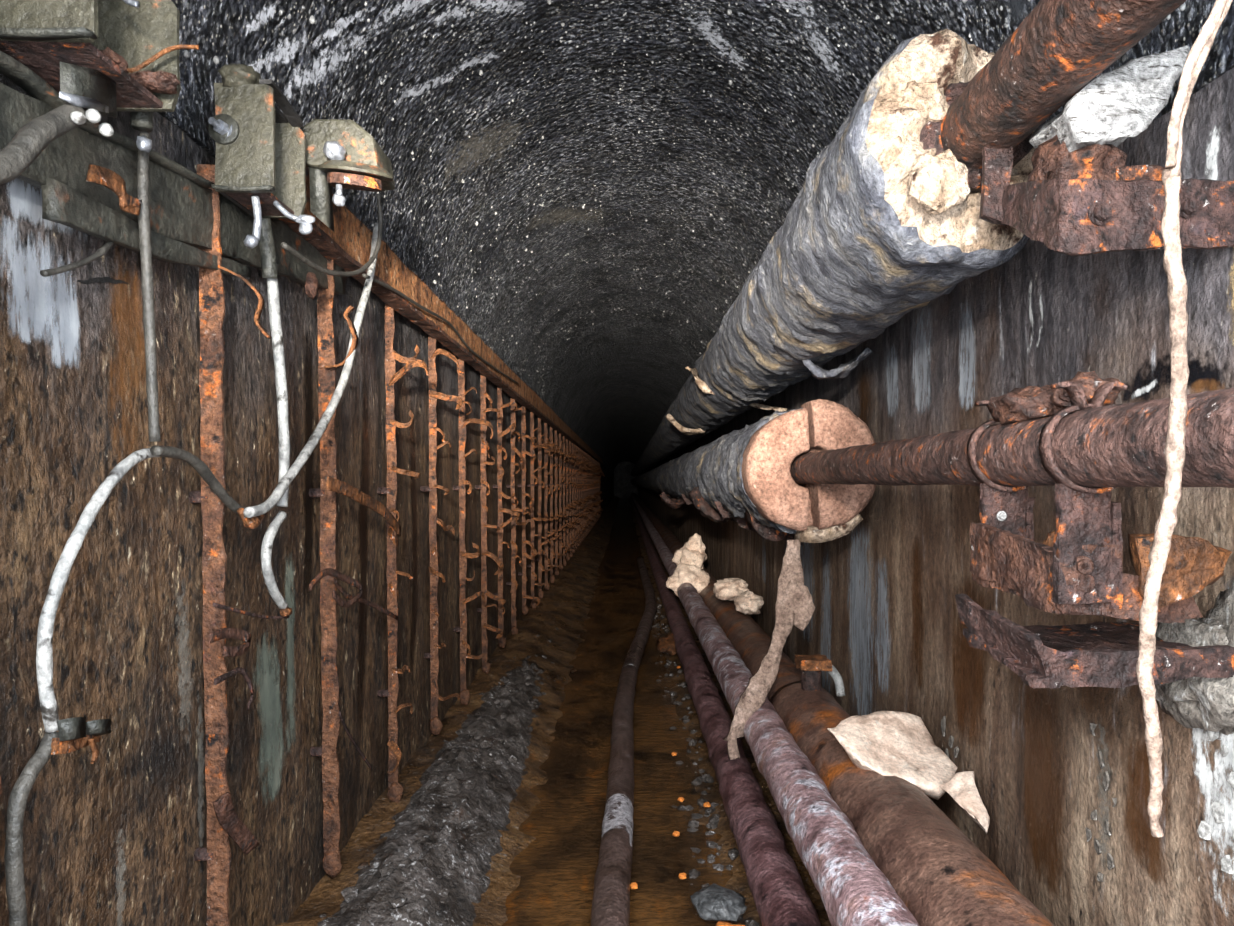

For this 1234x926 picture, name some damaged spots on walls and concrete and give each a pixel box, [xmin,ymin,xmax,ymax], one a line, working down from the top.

rust [912,542,923,686]
rust [953,609,983,742]
rust [1025,691,1062,890]
rust [1126,748,1168,878]